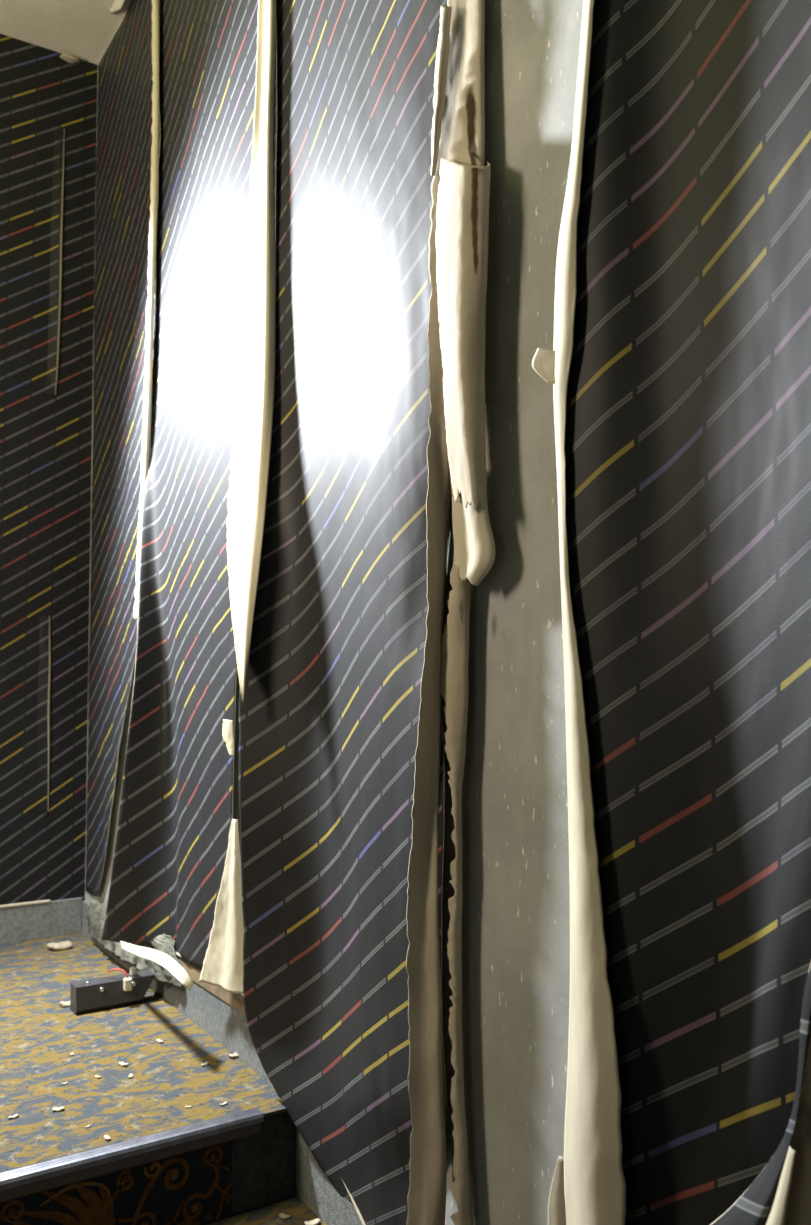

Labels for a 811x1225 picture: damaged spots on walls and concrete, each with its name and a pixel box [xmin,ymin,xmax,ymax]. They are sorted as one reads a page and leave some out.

peeling [109,0,125,14]
peeling [430,6,452,176]